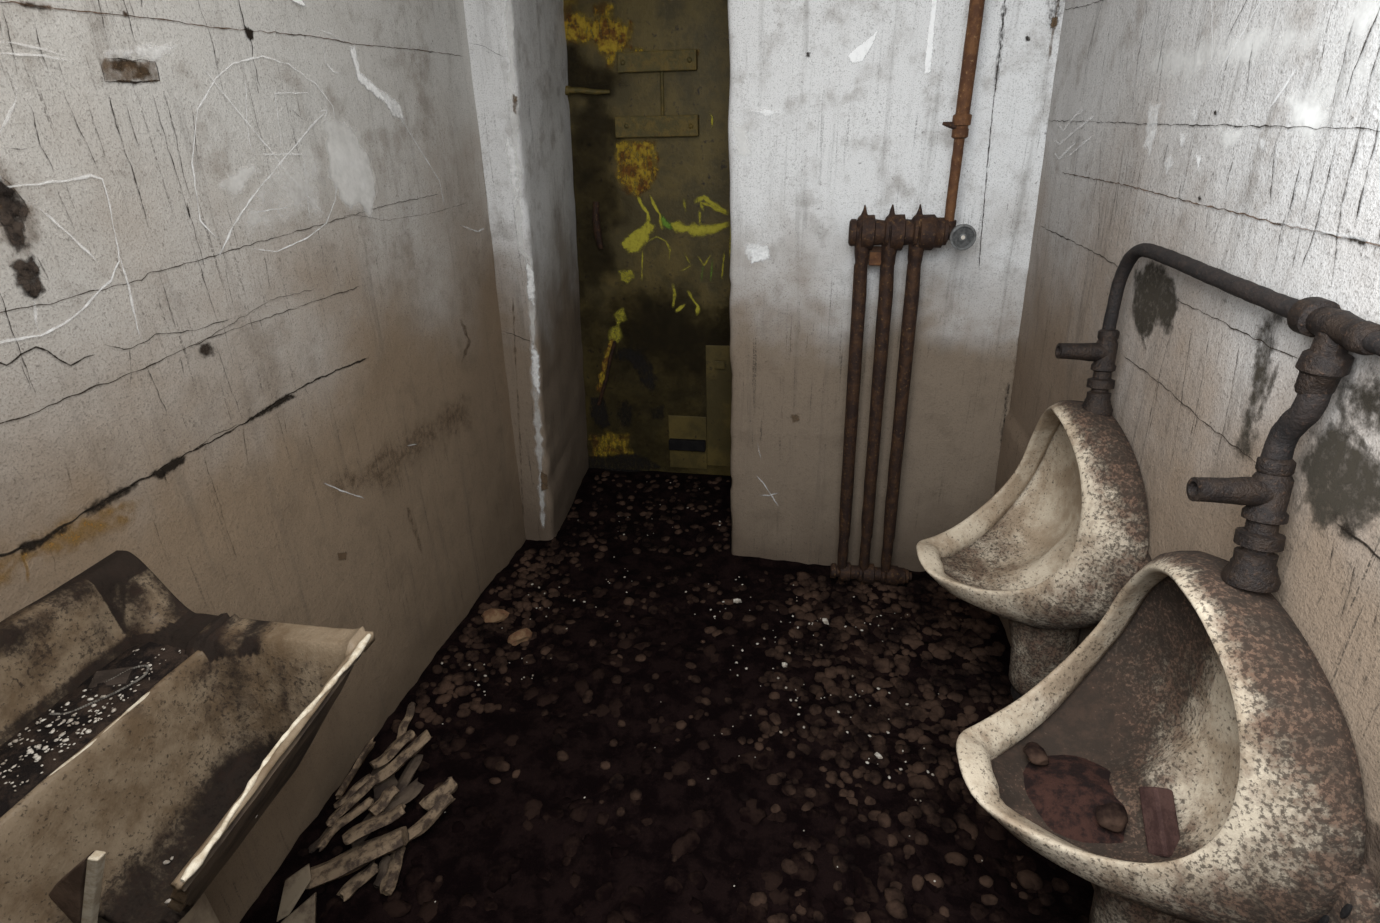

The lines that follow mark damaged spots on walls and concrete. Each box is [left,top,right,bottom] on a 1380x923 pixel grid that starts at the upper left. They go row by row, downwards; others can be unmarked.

spalling [112,59,151,78]
crack [0,1,499,85]
crack [1053,110,1380,132]
spalling [0,175,46,298]
crack [0,194,465,313]
crack [1064,173,1380,246]
crack [0,286,358,424]
damp [1132,263,1177,468]
crack [1179,301,1297,358]
damp [1217,313,1282,457]
crack [0,358,366,557]
damp [1301,380,1380,538]